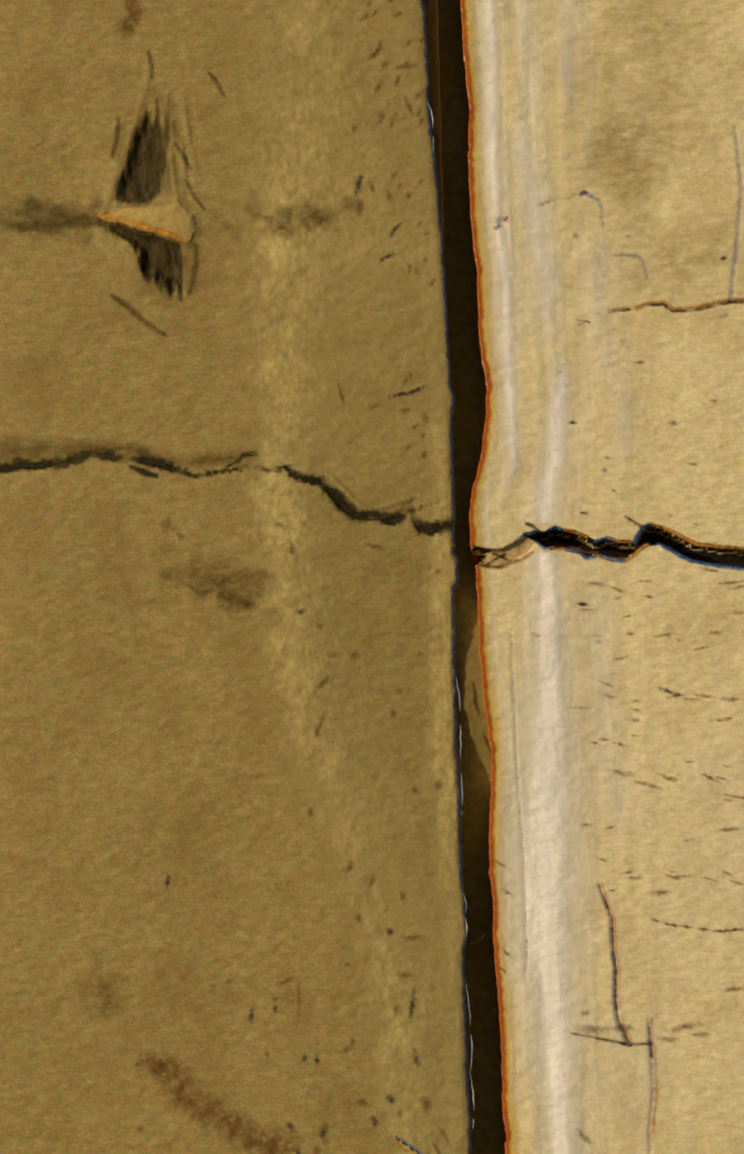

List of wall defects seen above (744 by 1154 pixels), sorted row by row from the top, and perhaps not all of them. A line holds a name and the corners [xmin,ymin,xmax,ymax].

spalling [116,112,166,203]
spalling [99,223,182,300]
crack [612,250,744,312]
crack [0,444,453,536]
crack [472,516,744,570]